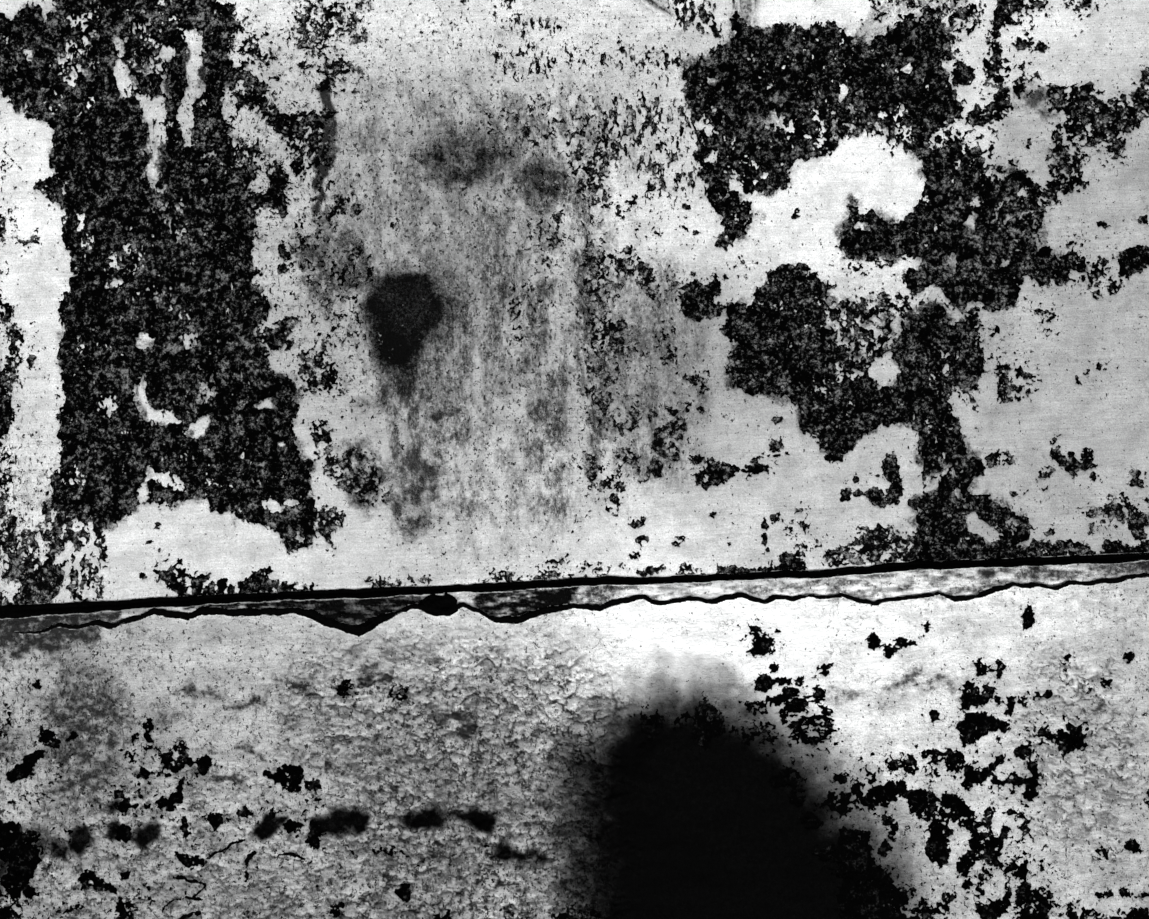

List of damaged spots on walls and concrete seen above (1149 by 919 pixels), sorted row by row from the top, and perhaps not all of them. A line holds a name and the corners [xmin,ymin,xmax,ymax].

peeling [0,0,391,555]
water stain [238,0,1149,617]
peeling [600,0,1149,562]
water stain [143,553,432,626]
peeling [0,590,650,919]
crack [0,553,1149,637]
water stain [610,691,921,919]
water stain [888,670,954,693]
peeling [737,601,1149,919]